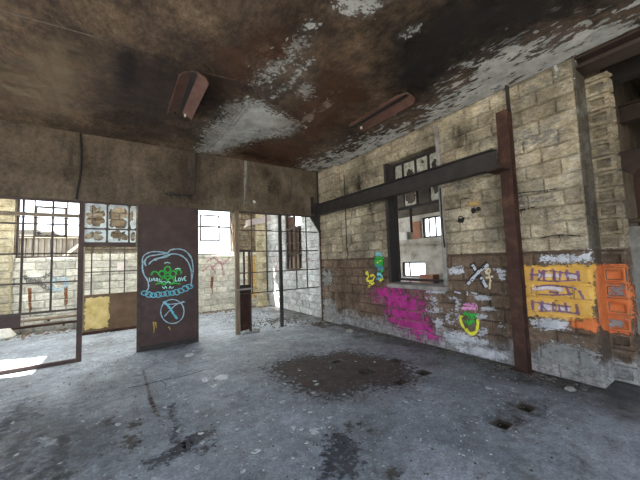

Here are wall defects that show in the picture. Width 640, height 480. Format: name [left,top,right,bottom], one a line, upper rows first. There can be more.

peeling [189,19,322,156]
peeling [289,0,640,172]
peeling [539,249,595,264]
peeling [533,339,612,386]